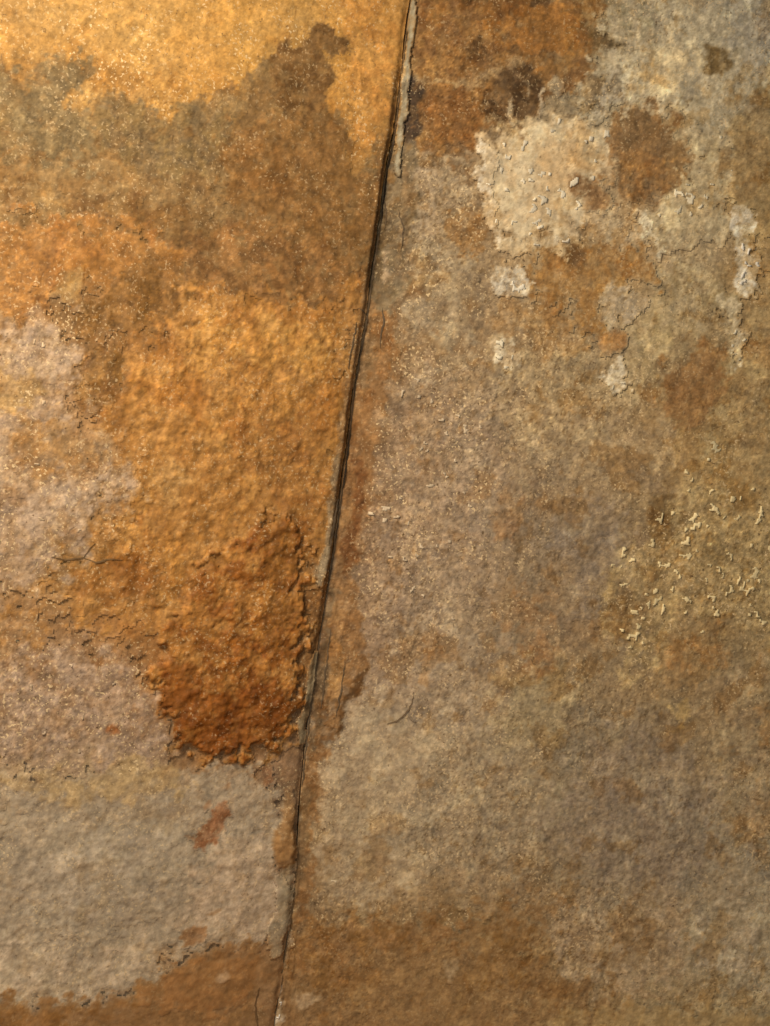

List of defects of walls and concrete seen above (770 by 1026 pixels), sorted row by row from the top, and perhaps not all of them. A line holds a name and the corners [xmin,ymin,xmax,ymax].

rust [0,200,362,778]
damp [0,0,621,925]
crack [302,33,407,783]
efflorescence [597,353,634,397]
damp [596,279,650,331]
efflorescence [627,207,671,262]
damp [709,72,770,376]
crack [388,692,415,724]
damp [515,693,745,904]
crack [252,989,260,1026]
damp [0,881,770,1026]